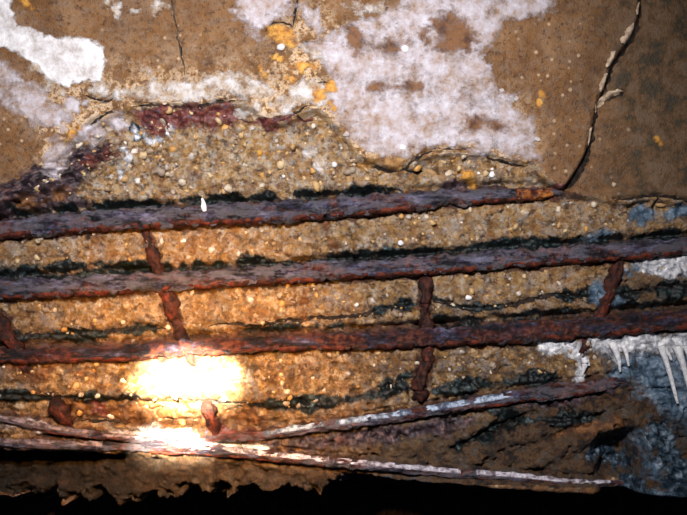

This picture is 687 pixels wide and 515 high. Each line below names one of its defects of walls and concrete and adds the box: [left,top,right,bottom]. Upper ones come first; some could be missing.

leakage [104,0,121,18]
efflorescence [131,126,173,145]
corrosion [129,102,312,142]
spalling [0,0,557,214]
crack [558,0,642,192]
corrosion [439,169,565,211]
spalling [0,190,687,280]
spalling [174,260,687,340]
corrosion [424,325,687,362]
corrosion [31,389,625,467]
spalling [0,329,687,505]
leakage [476,332,687,498]